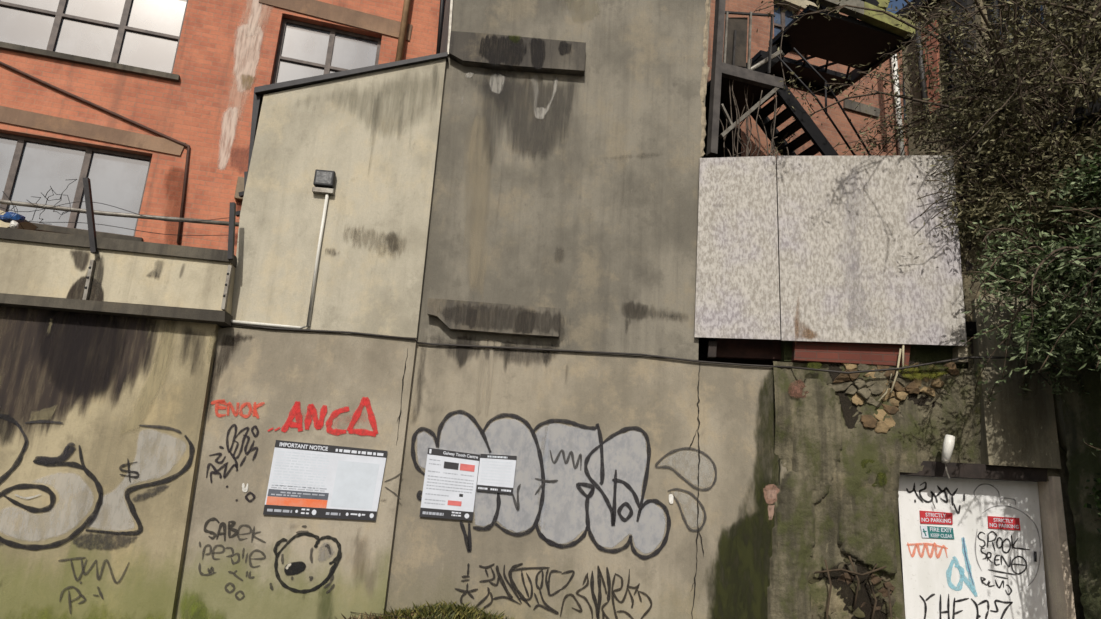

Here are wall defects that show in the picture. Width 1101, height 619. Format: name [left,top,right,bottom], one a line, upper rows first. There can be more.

water stain [219,0,267,170]
water stain [490,38,574,155]
spalling [700,0,710,157]
water stain [67,250,104,301]
water stain [42,310,125,395]
water stain [209,336,246,404]
water stain [448,312,551,415]
spalling [827,344,959,433]
crack [689,369,704,619]